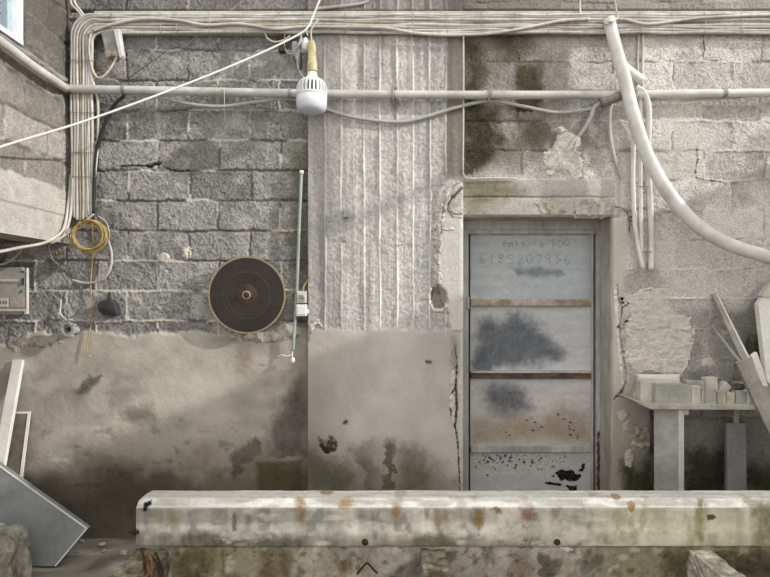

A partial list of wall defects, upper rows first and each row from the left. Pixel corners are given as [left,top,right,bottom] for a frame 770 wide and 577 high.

flaking render [543,126,583,180]
spalling [427,179,463,332]
crack [613,285,633,397]
damp [319,436,343,457]
crack [449,347,461,490]